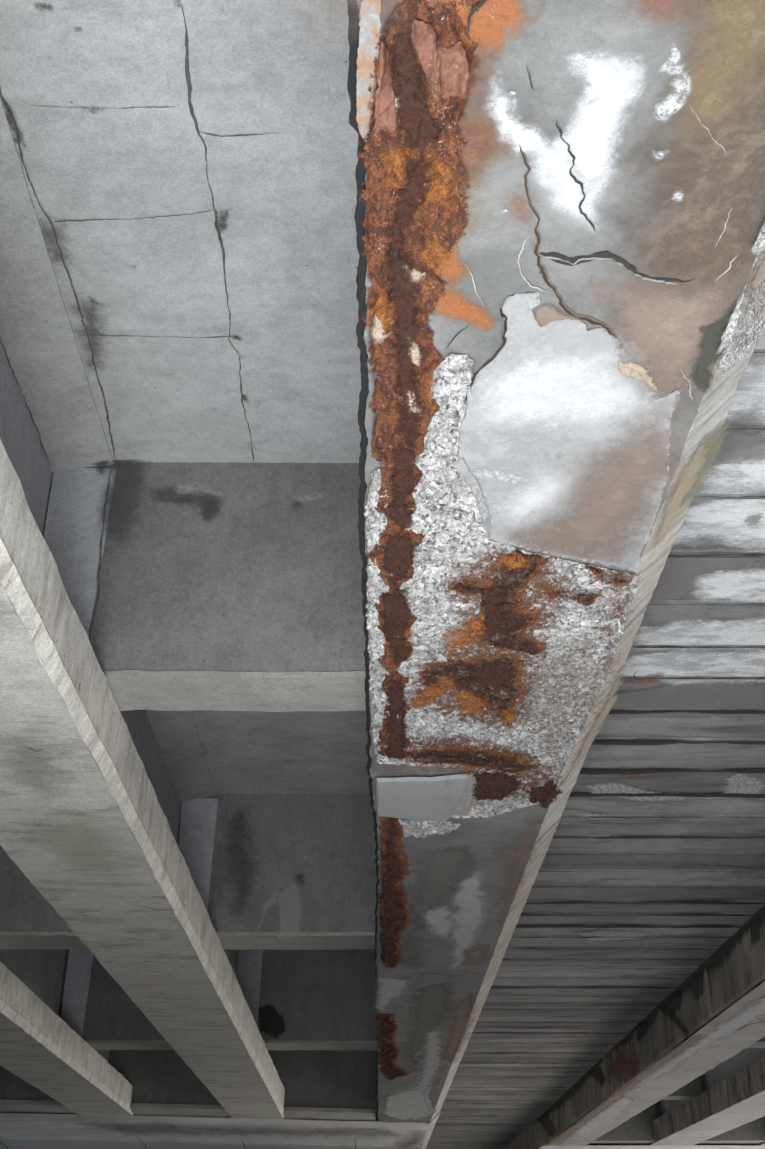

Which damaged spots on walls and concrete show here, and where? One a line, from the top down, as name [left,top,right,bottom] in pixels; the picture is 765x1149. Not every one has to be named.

corrosion [387,0,523,167]
leakage [491,54,644,223]
crack [0,2,271,641]
crack [446,265,507,401]
crack [518,121,738,337]
spalling [716,222,765,374]
spalling [356,0,680,968]